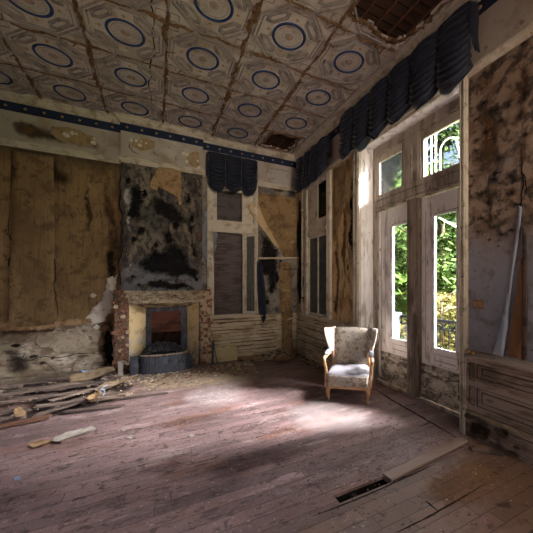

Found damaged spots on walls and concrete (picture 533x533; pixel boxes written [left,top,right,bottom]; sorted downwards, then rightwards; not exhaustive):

crack [0,0,395,145]
water stain [15,122,61,142]
water stain [474,102,503,164]
water stain [124,177,147,230]
water stain [152,199,218,262]
crack [517,156,527,219]
mould [148,279,188,290]
mould [259,235,279,293]
mould [9,343,54,373]
peeling [34,329,91,354]
flaking render [85,274,131,375]